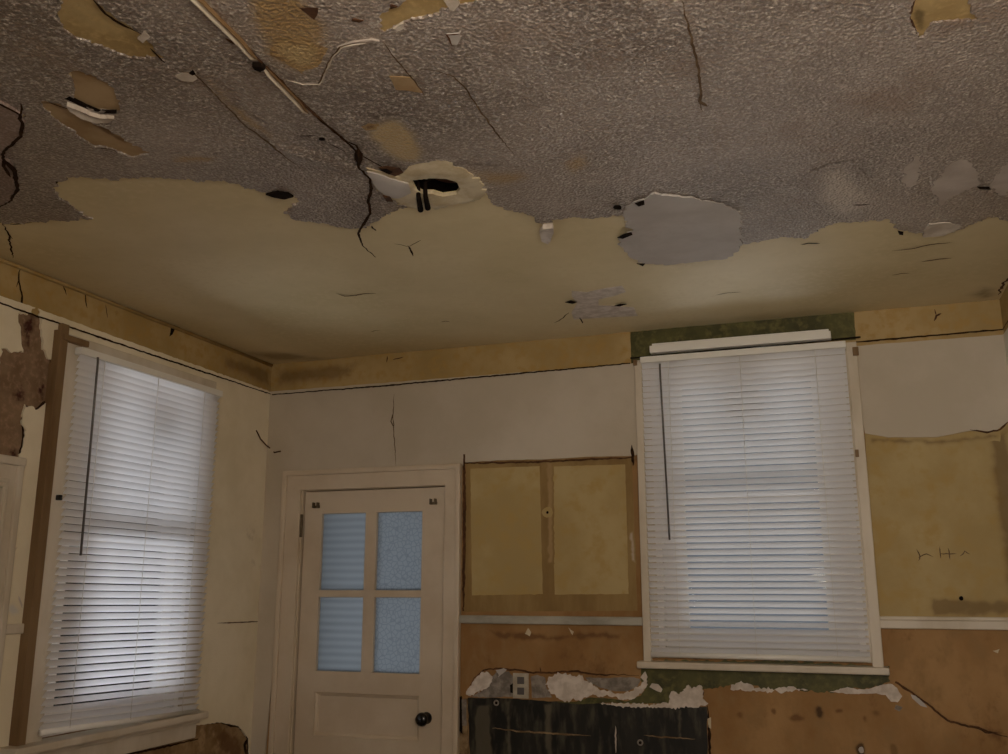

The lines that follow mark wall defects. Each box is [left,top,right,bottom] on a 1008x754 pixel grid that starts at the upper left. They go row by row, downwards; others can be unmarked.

peeling [57,0,164,58]
peeling [379,0,474,31]
crack [682,1,708,110]
peeling [911,0,977,36]
crack [181,38,513,257]
crack [0,104,32,303]
flaking render [367,171,411,202]
peeling [540,223,554,244]
spalling [211,722,248,754]
flaking render [459,668,513,754]
flaking render [531,672,708,710]
crack [895,680,1008,737]